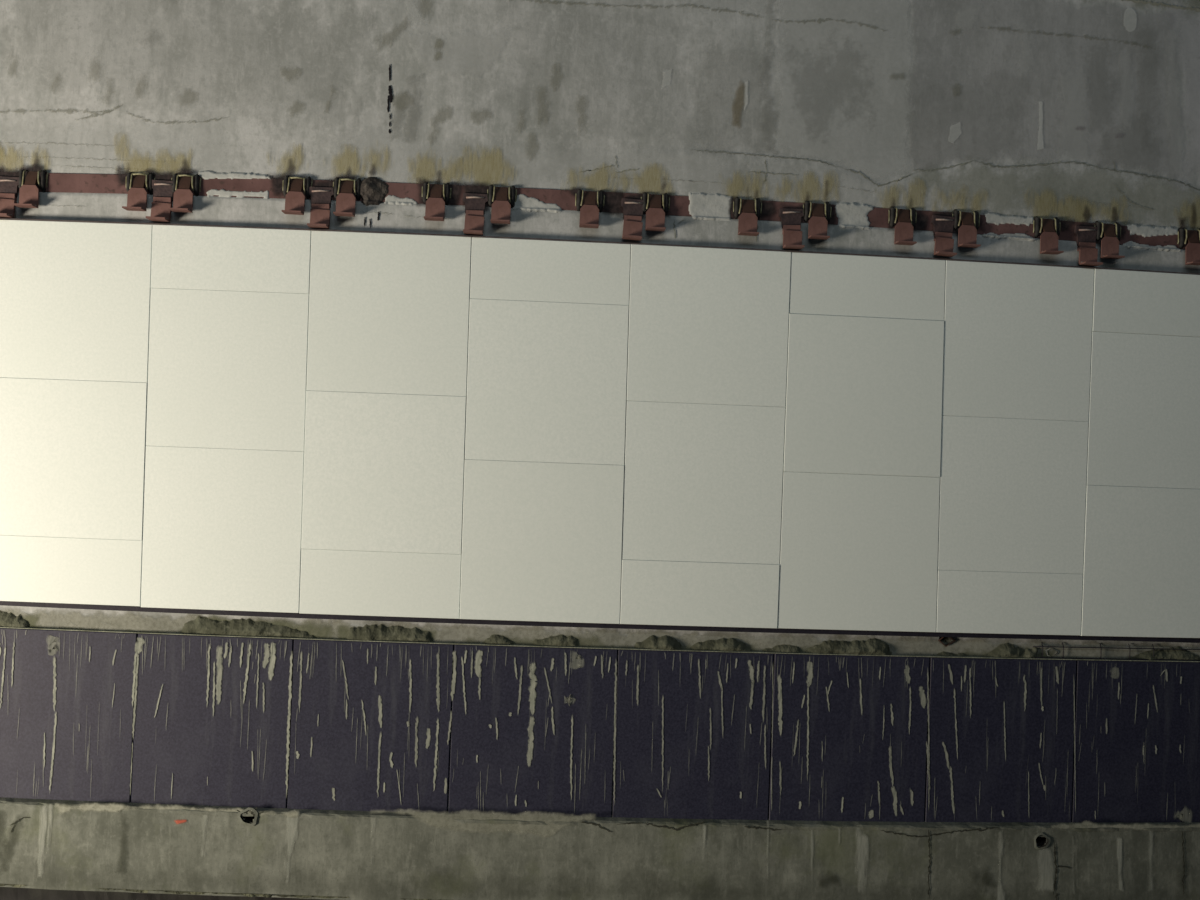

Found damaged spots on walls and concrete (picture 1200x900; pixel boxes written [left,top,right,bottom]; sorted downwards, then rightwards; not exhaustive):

leakage [119,137,191,174]
leakage [335,149,388,174]
leakage [416,150,513,186]
leakage [570,165,671,194]
crack [697,150,1200,210]